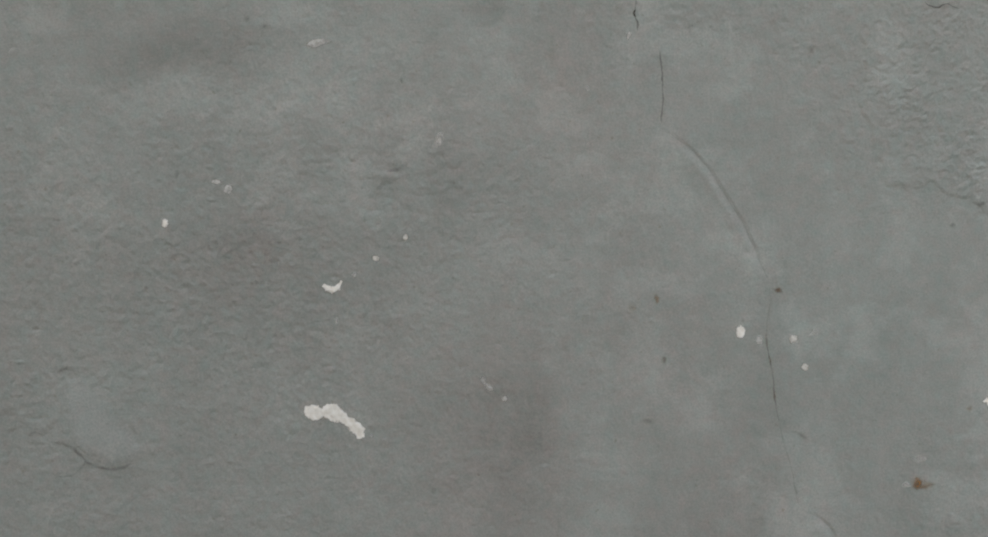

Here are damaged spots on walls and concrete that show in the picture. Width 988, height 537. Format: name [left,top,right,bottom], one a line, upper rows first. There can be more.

spalling [322,280,343,294]
spalling [304,404,365,439]